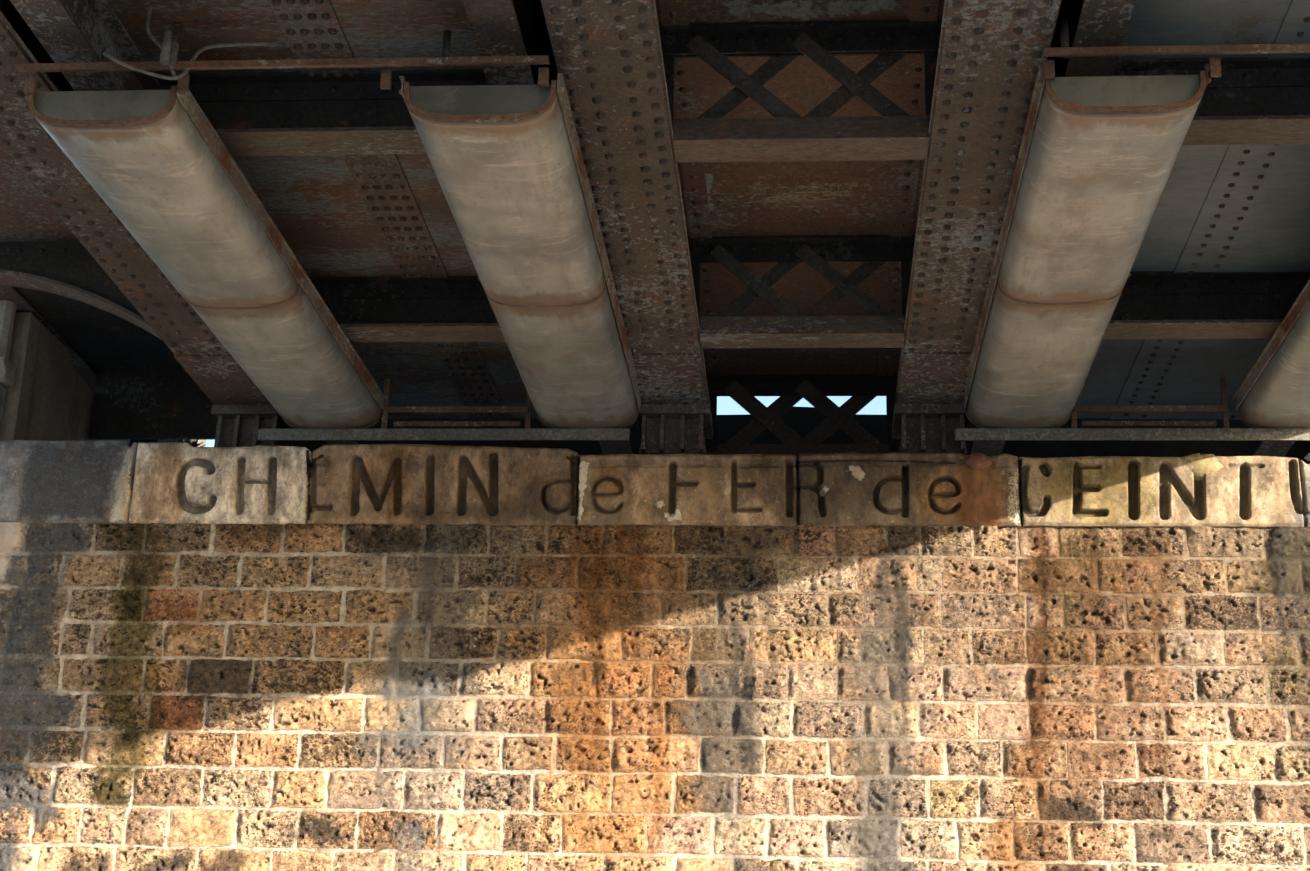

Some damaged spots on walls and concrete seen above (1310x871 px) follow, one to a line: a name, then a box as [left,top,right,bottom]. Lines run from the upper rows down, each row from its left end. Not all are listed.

peeling [720,0,902,22]
corrosion [195,49,295,61]